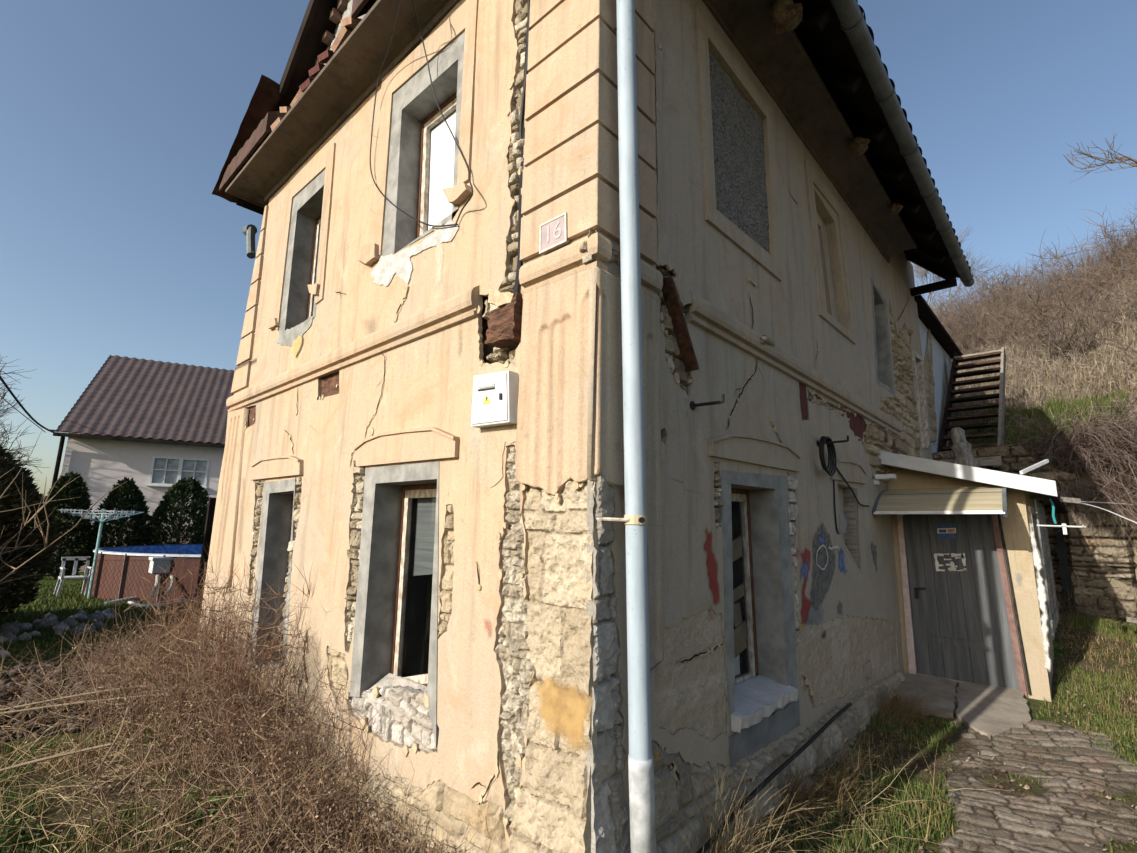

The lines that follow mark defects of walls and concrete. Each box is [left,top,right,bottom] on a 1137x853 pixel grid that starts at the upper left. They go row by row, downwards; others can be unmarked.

crack [391,298,406,324]
flaking render [371,219,460,300]
flaking render [656,264,694,394]
crack [746,273,759,329]
crack [350,352,386,468]
crack [727,358,764,428]
flaking render [857,306,937,483]
flaking render [283,461,631,853]
flaking render [652,474,906,853]